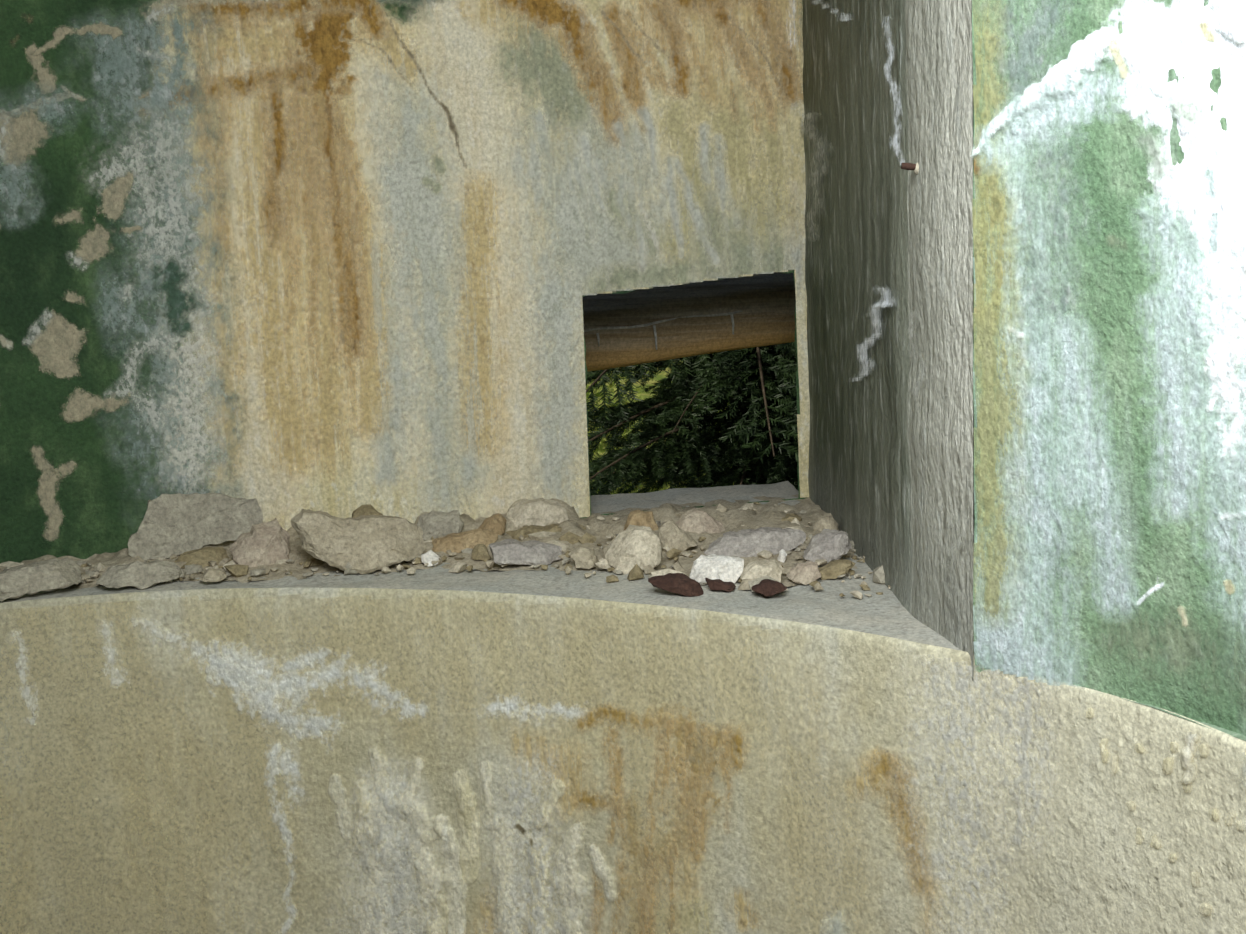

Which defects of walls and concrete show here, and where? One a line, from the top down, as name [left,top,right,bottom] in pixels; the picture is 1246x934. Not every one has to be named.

flaking render [0,22,123,227]
peeling [55,171,142,268]
water stain [88,12,235,499]
rust [168,0,416,475]
crack [373,19,464,163]
rust [480,0,804,142]
peeling [31,446,77,541]
peeling [0,311,129,422]
water stain [909,0,1246,934]
water stain [144,622,427,933]
rust [514,705,743,934]
rust [857,751,934,934]